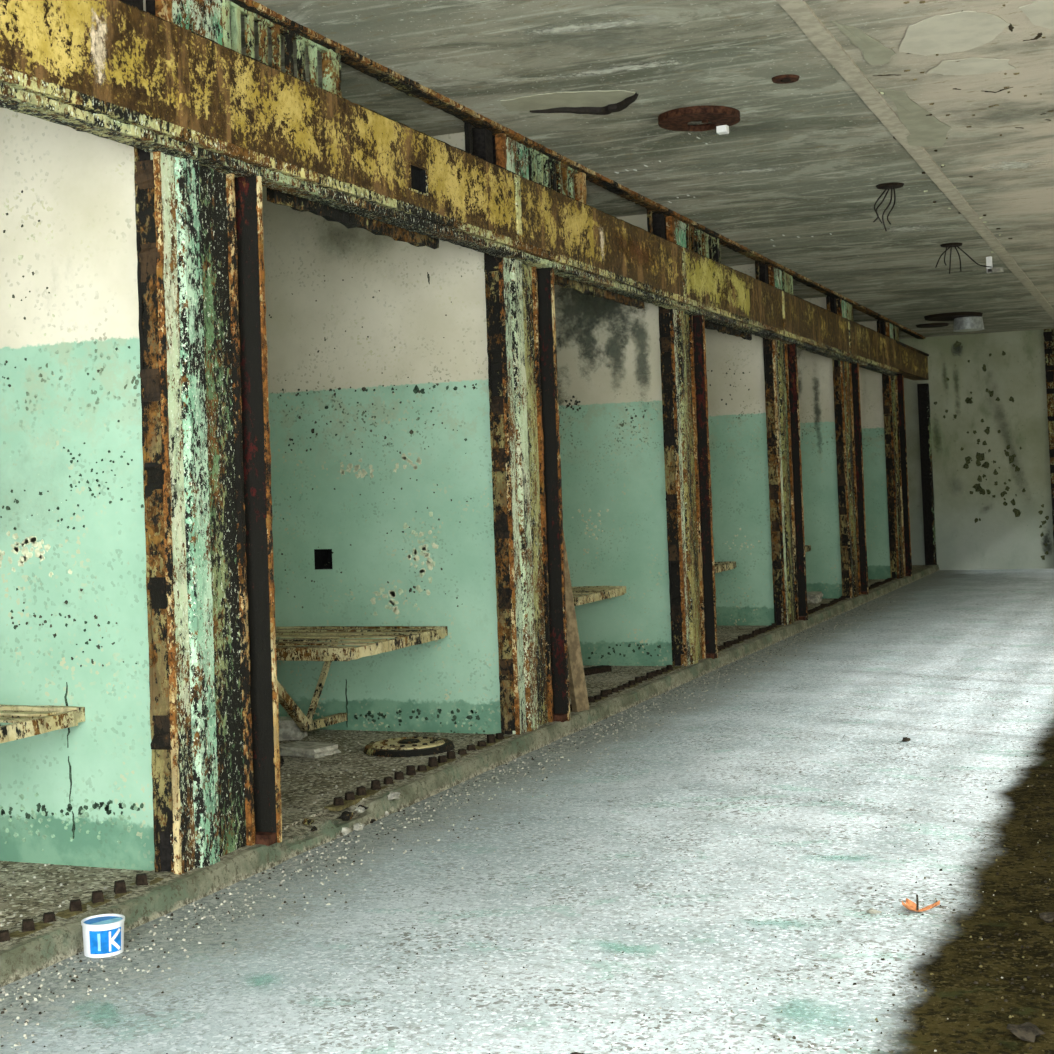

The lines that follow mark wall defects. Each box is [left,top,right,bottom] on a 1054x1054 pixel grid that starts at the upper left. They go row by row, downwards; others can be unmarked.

rust [90,11,106,83]
peeling [500,90,639,115]
leakage [557,288,648,384]